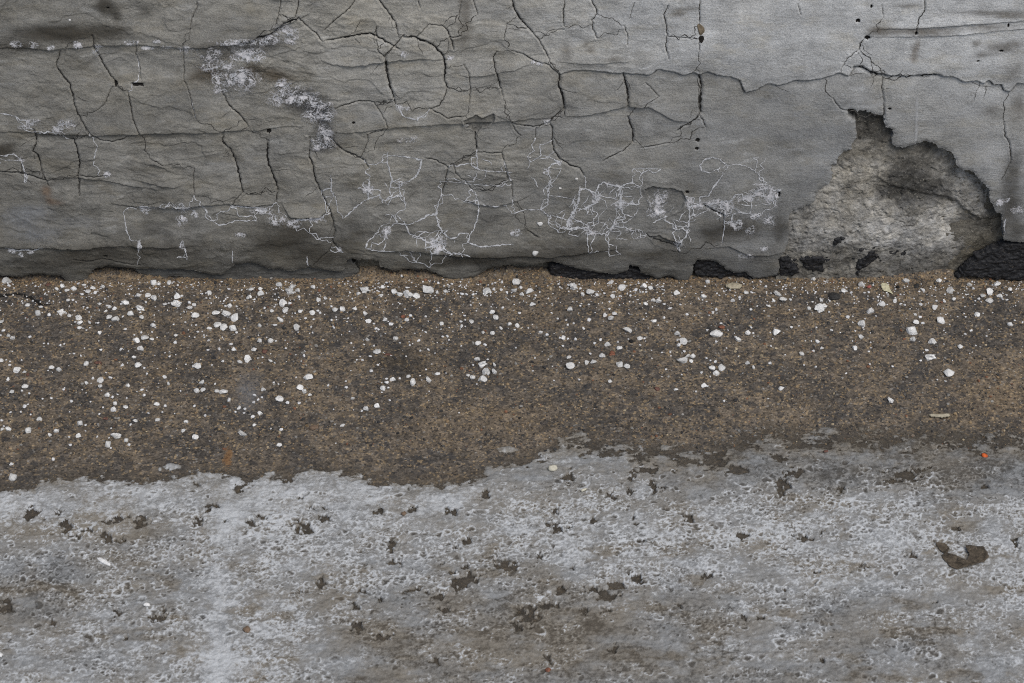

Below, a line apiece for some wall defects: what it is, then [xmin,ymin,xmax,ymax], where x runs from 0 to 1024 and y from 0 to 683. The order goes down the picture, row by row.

damp [199,25,334,151]
crack [2,0,795,262]
damp [123,138,781,268]
crack [825,8,937,118]
flaking render [776,109,1007,279]
crack [961,80,1011,178]